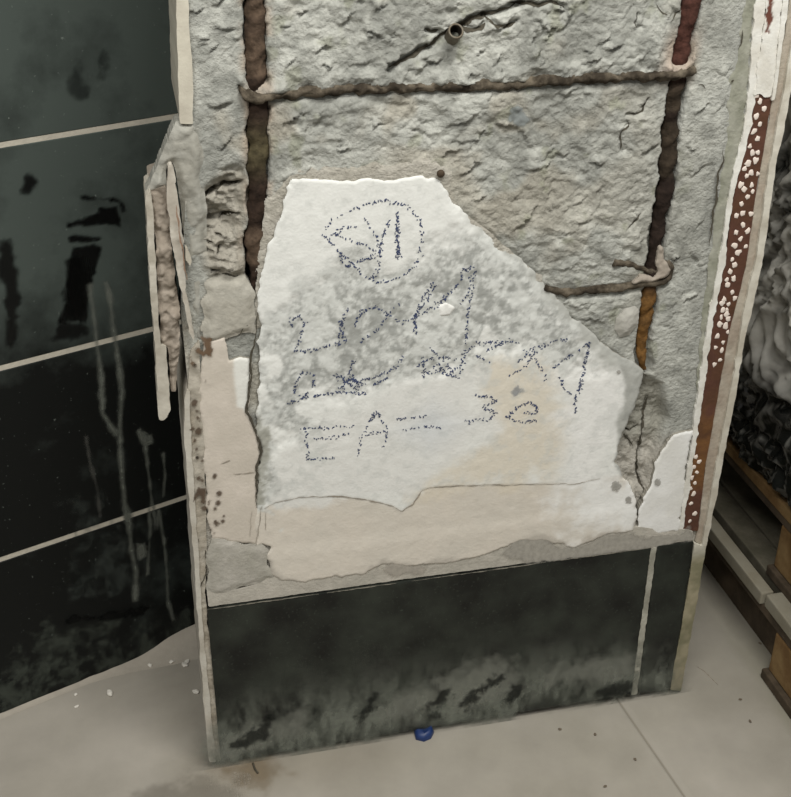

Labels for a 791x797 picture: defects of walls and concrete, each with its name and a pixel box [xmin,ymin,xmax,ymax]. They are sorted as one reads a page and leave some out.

crack [389,0,564,67]
spalling [144,0,753,583]
crack [623,397,648,498]
leakage [213,693,398,765]
leakage [411,668,559,723]
leakage [587,660,667,700]